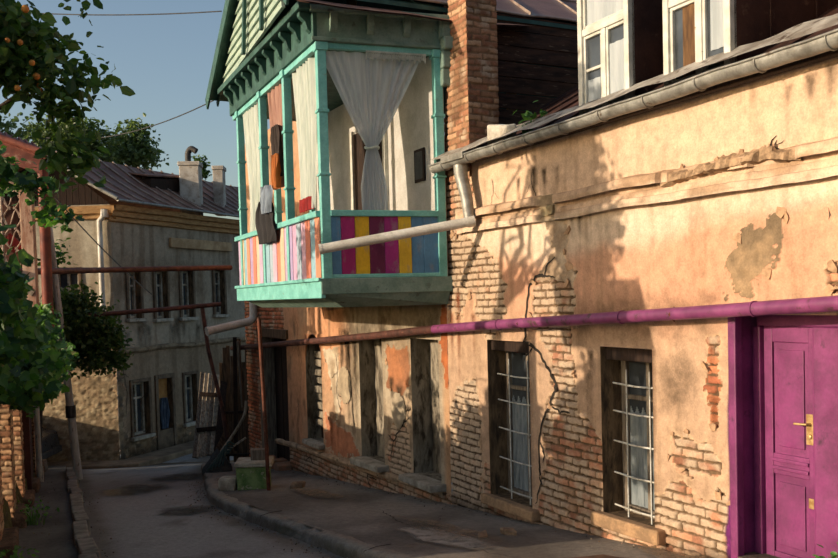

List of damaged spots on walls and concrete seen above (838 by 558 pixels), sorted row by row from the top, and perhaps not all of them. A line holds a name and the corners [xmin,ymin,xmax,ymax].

spalling [290,175,730,558]
crack [523,257,570,504]
flaking render [722,207,789,301]